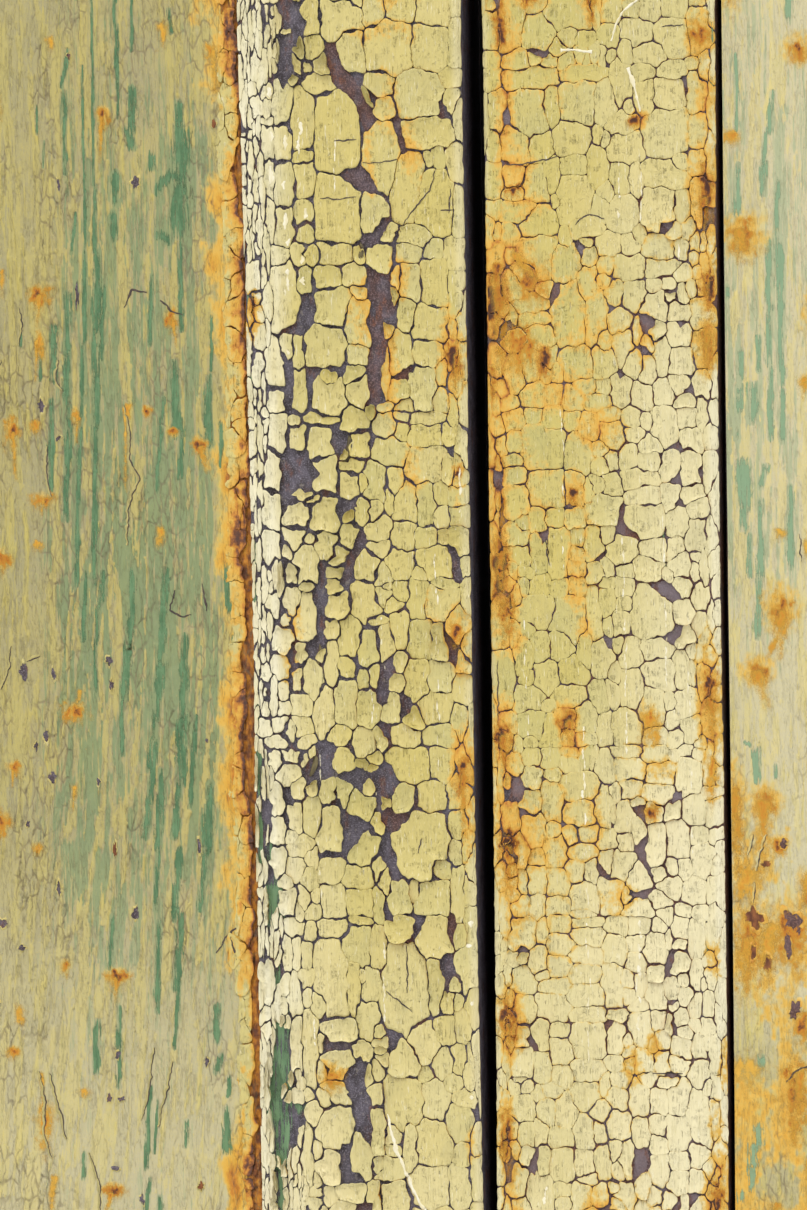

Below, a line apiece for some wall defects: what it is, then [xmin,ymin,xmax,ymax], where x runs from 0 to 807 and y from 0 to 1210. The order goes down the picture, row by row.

peeling [267,0,409,154]
rust [699,165,713,237]
rust [487,252,551,399]
peeling [264,217,413,665]
peeling [415,510,470,604]
crack [216,0,767,1210]
rust [491,495,515,642]
peeling [269,651,440,881]
peeling [372,886,474,1017]
rust [731,787,807,993]
peeling [313,977,404,1156]
rust [735,1058,764,1087]